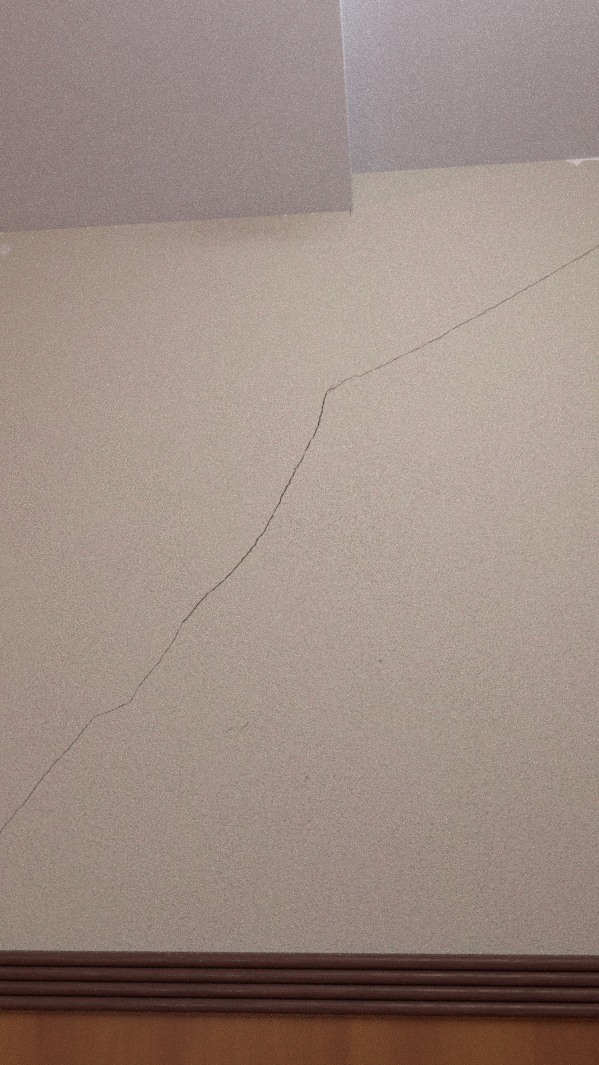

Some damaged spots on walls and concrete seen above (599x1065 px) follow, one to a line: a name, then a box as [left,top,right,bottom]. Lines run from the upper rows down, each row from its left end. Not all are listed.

crack [0,246,598,833]